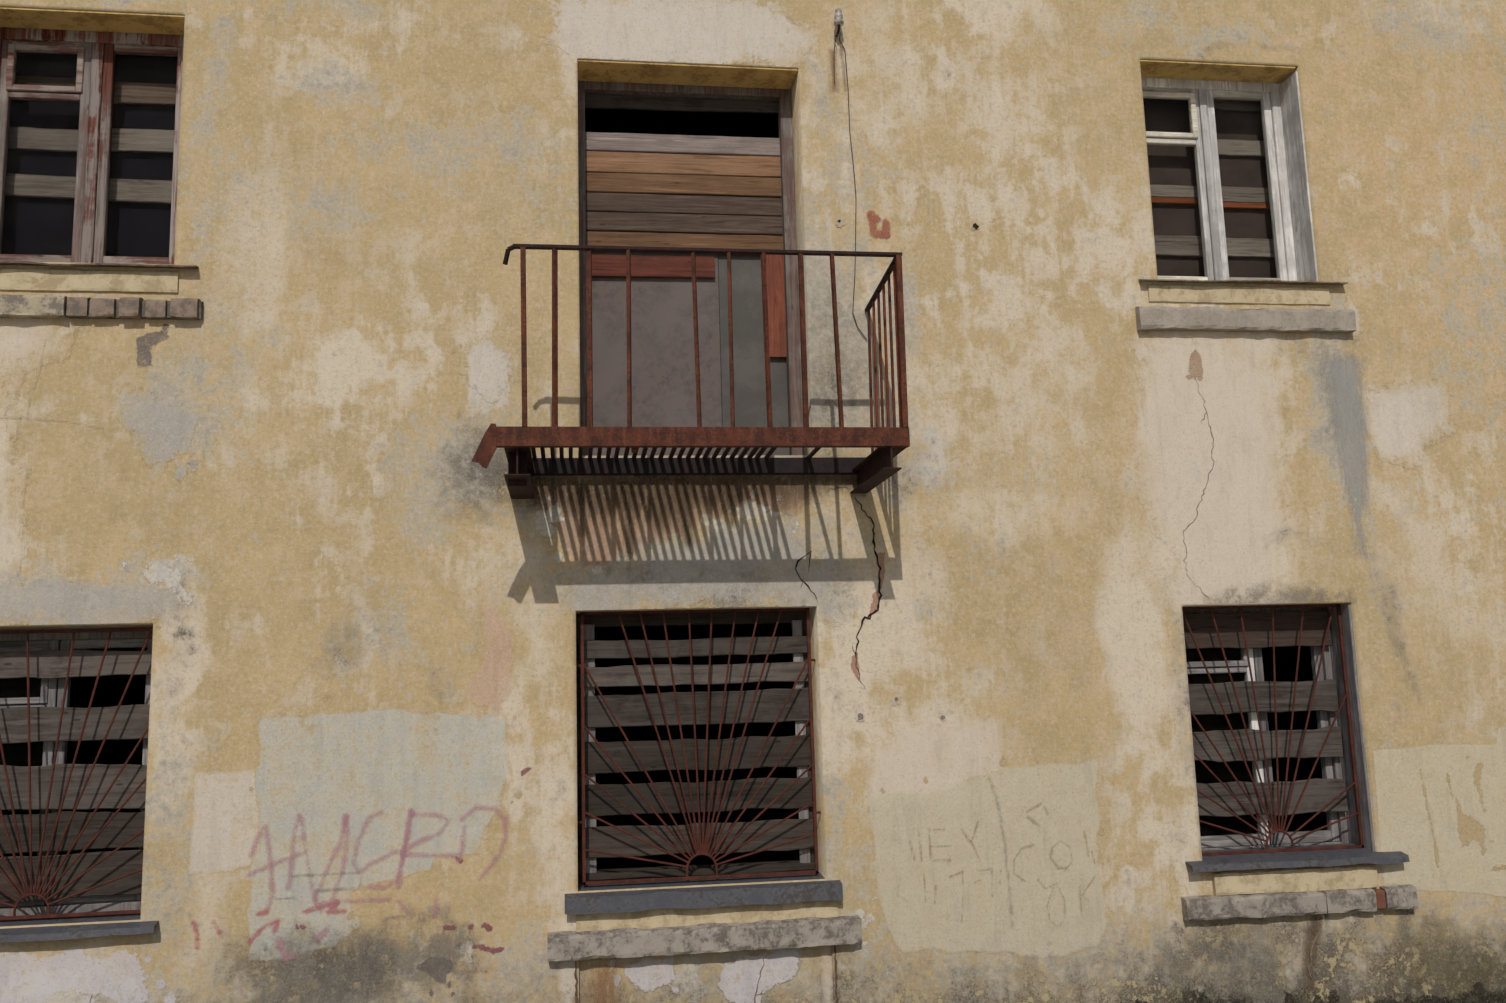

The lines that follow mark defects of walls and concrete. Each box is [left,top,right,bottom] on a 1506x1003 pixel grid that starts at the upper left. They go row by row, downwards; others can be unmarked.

peeling [538,0,814,68]
spalling [0,317,194,628]
leakage [530,475,857,553]
crack [1183,375,1214,598]
leakage [1329,356,1367,556]
crack [827,486,885,687]
peeling [0,945,176,1003]
peeling [610,955,680,994]
peeling [715,945,834,1003]
leakage [1304,914,1325,991]
leakage [1412,939,1506,998]